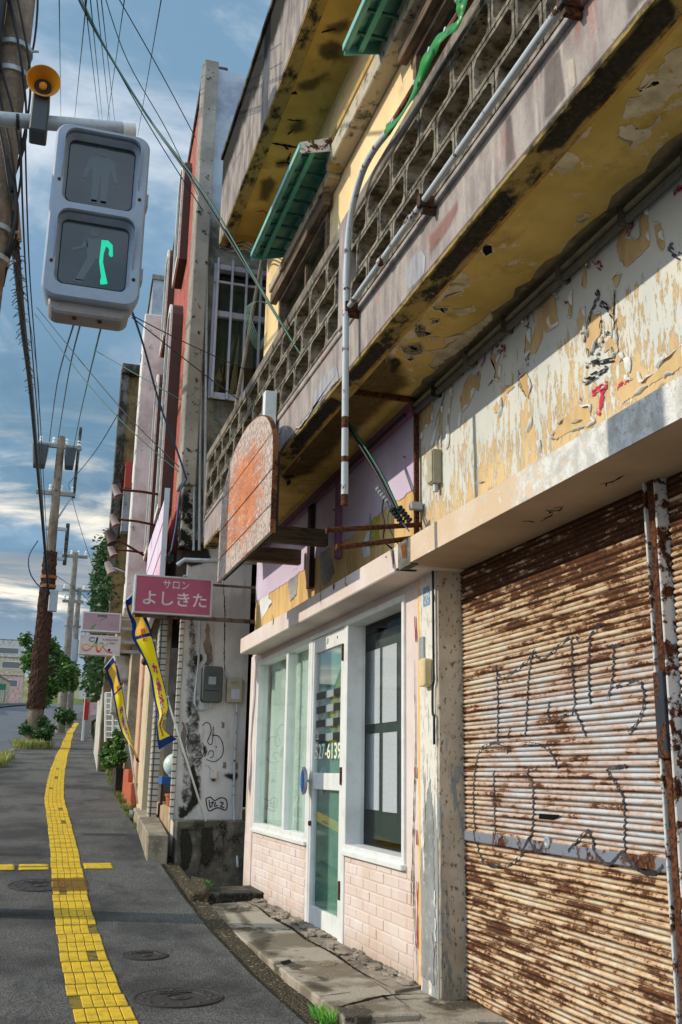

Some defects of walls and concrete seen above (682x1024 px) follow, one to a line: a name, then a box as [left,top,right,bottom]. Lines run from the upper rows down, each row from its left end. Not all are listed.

damp [321,22,347,59]
damp [537,0,675,153]
peeling [618,47,682,149]
damp [261,178,274,200]
damp [430,192,512,280]
flaking render [385,126,682,452]
damp [284,343,405,479]
peeling [259,594,272,618]
peeling [288,568,298,601]
peeling [362,530,370,558]
damp [179,620,225,869]